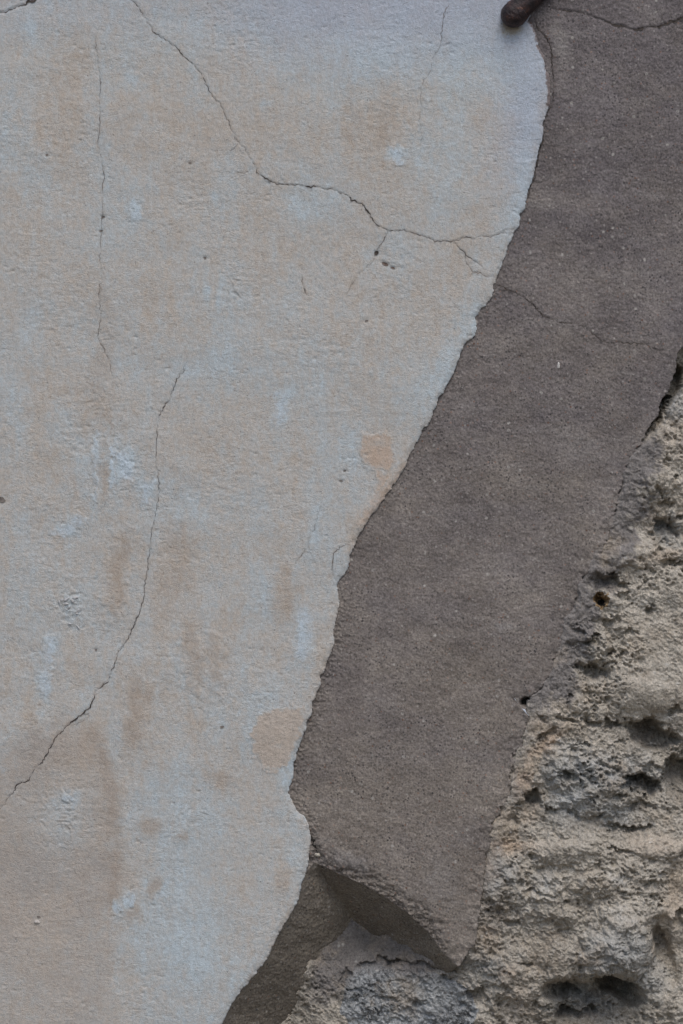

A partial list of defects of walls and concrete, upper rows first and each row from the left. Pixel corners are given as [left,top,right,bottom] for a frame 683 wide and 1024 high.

flaking render [526,16,550,113]
crack [131,0,661,351]
crack [0,366,184,809]
flaking render [246,702,309,775]
spalling [223,863,457,1024]